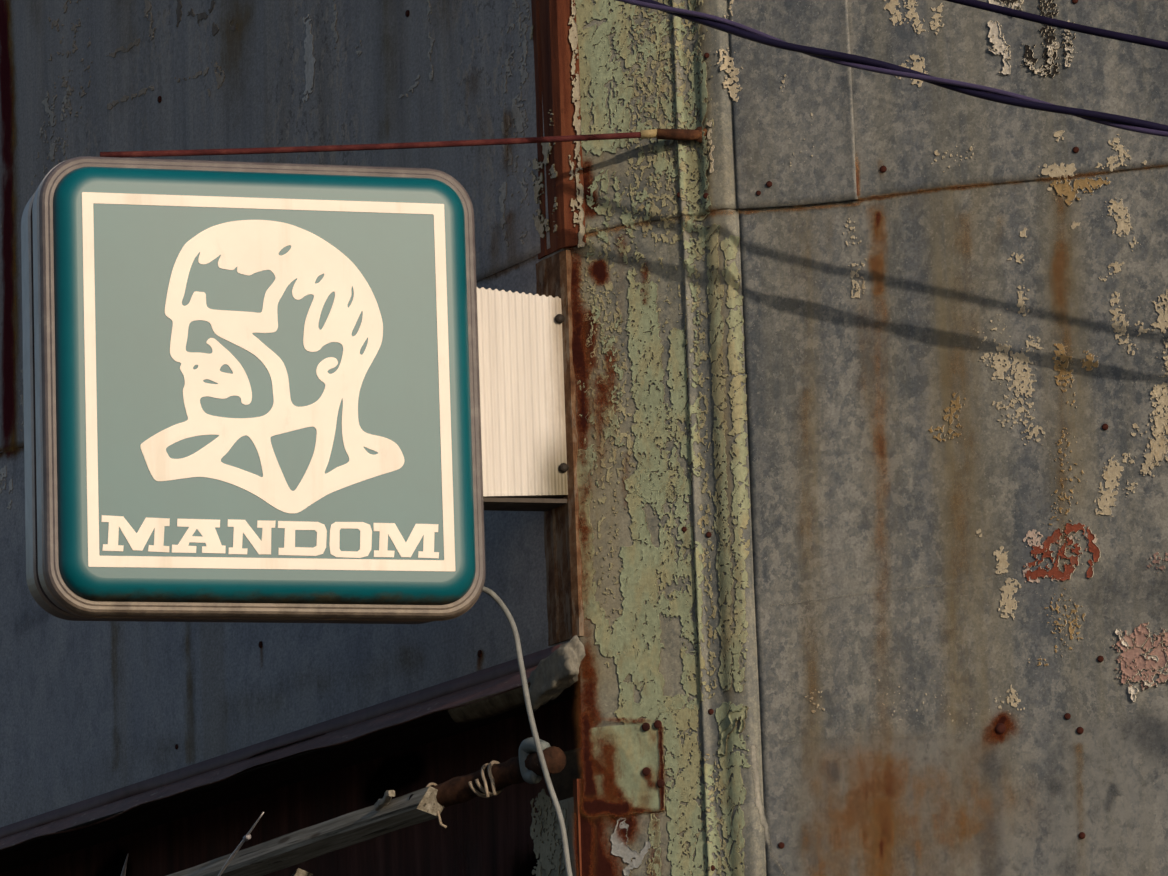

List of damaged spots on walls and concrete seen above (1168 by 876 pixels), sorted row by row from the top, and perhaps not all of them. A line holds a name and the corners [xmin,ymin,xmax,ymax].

peeling [884,0,944,35]
peeling [988,0,1078,80]
rust [0,0,21,457]
rust [583,161,598,217]
rust [848,162,905,294]
peeling [1038,134,1147,206]
rust [568,247,615,464]
peeling [530,0,751,876]
peeling [971,285,1168,666]
peeling [1112,622,1168,702]
rust [573,634,665,876]
rust [984,714,1015,745]